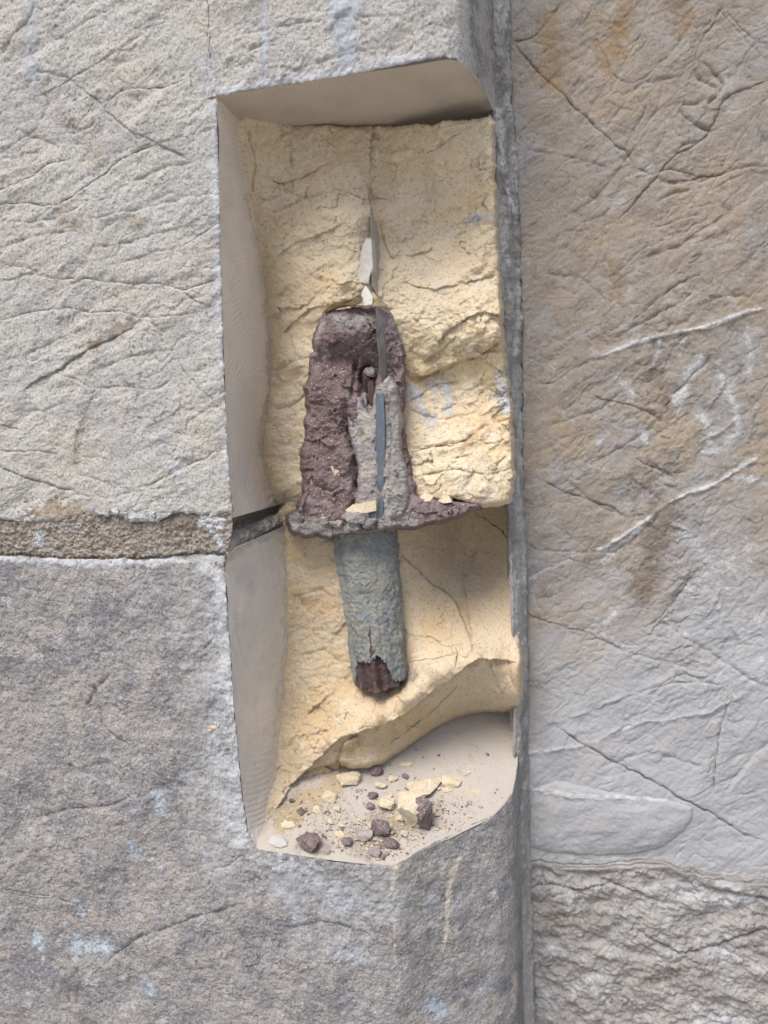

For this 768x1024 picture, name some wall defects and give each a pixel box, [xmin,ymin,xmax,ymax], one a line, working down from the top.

crack [1,33,200,206]
crack [509,3,768,228]
crack [2,265,222,491]
peeling [324,285,388,313]
spalling [345,500,378,513]
spalling [420,491,453,504]
crack [481,517,619,561]
crack [521,332,627,517]
rust [356,629,402,695]
crack [558,681,763,840]